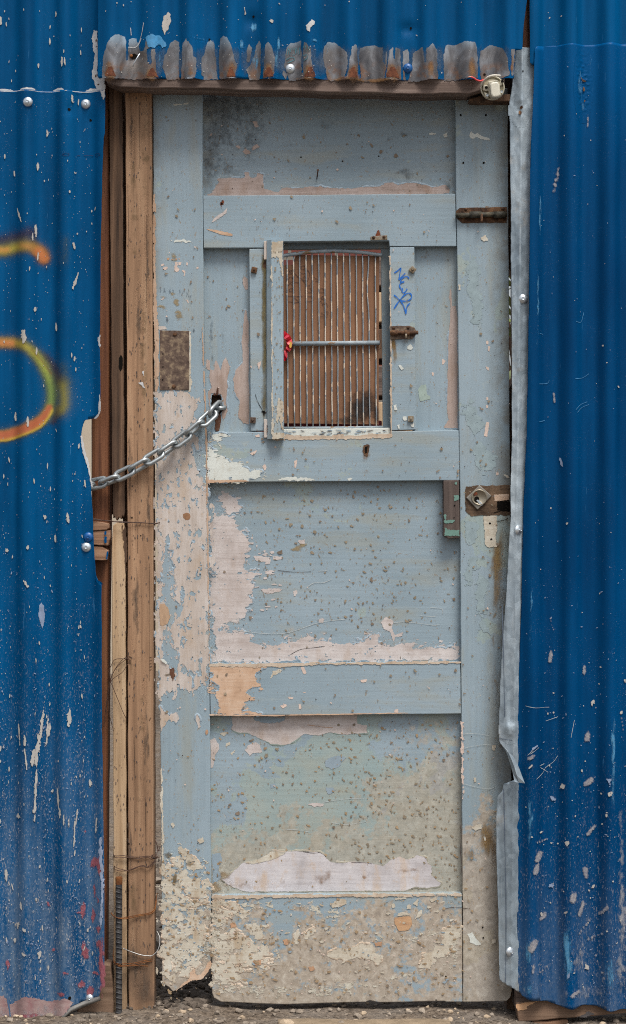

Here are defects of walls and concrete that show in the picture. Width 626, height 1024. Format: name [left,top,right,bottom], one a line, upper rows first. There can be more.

corrosion [336,66,400,82]
peeling [149,241,461,768]
peeling [155,837,481,999]